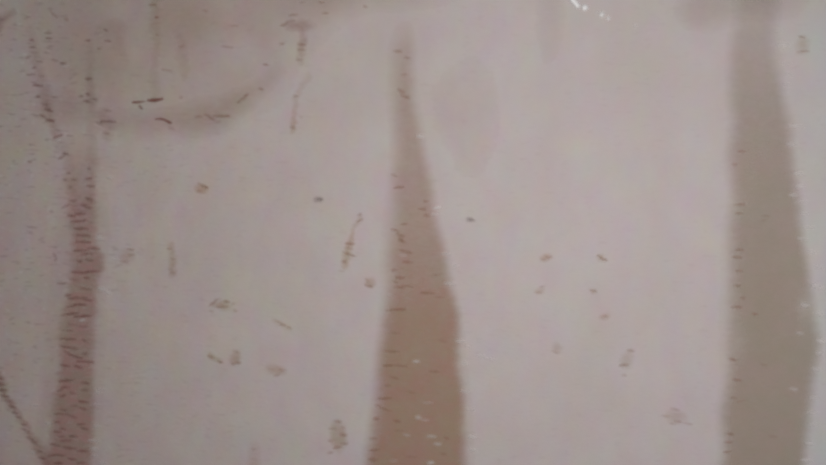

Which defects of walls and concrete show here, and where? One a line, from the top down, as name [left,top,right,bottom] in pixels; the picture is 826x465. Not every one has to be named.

leakage [730,158,822,465]